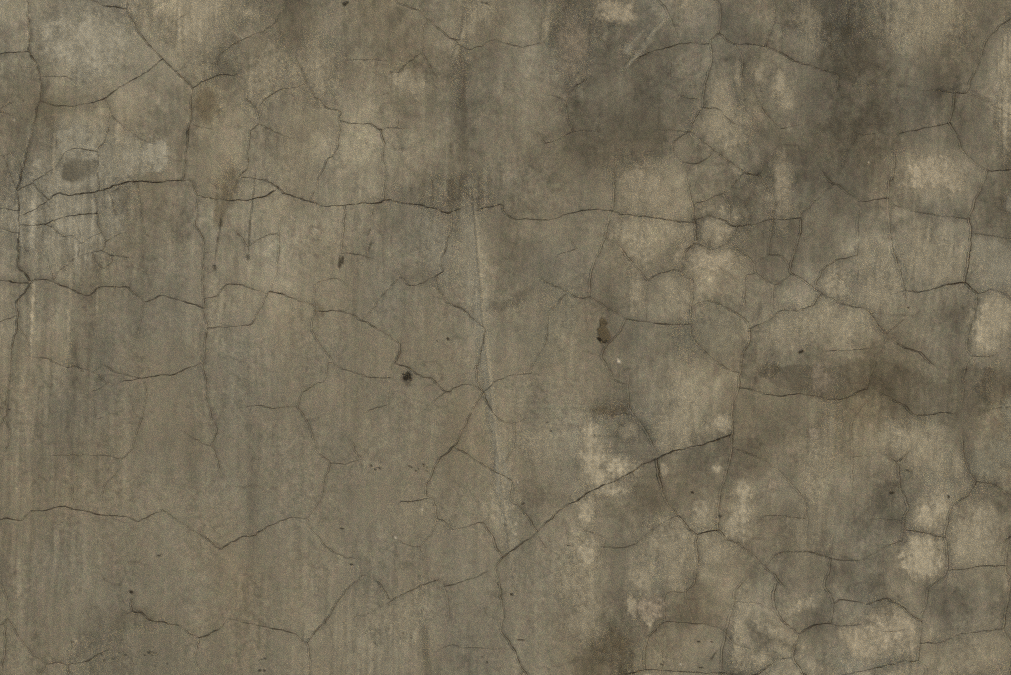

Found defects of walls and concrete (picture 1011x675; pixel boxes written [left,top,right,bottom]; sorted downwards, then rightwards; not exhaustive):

water stain [596,0,637,24]
crack [640,15,837,189]
water stain [773,69,794,110]
crack [902,19,1011,152]
water stain [775,164,789,213]
crack [0,3,511,521]
crack [272,157,1011,675]
water stain [888,400,1011,479]
crack [199,518,288,550]
crack [131,601,224,665]